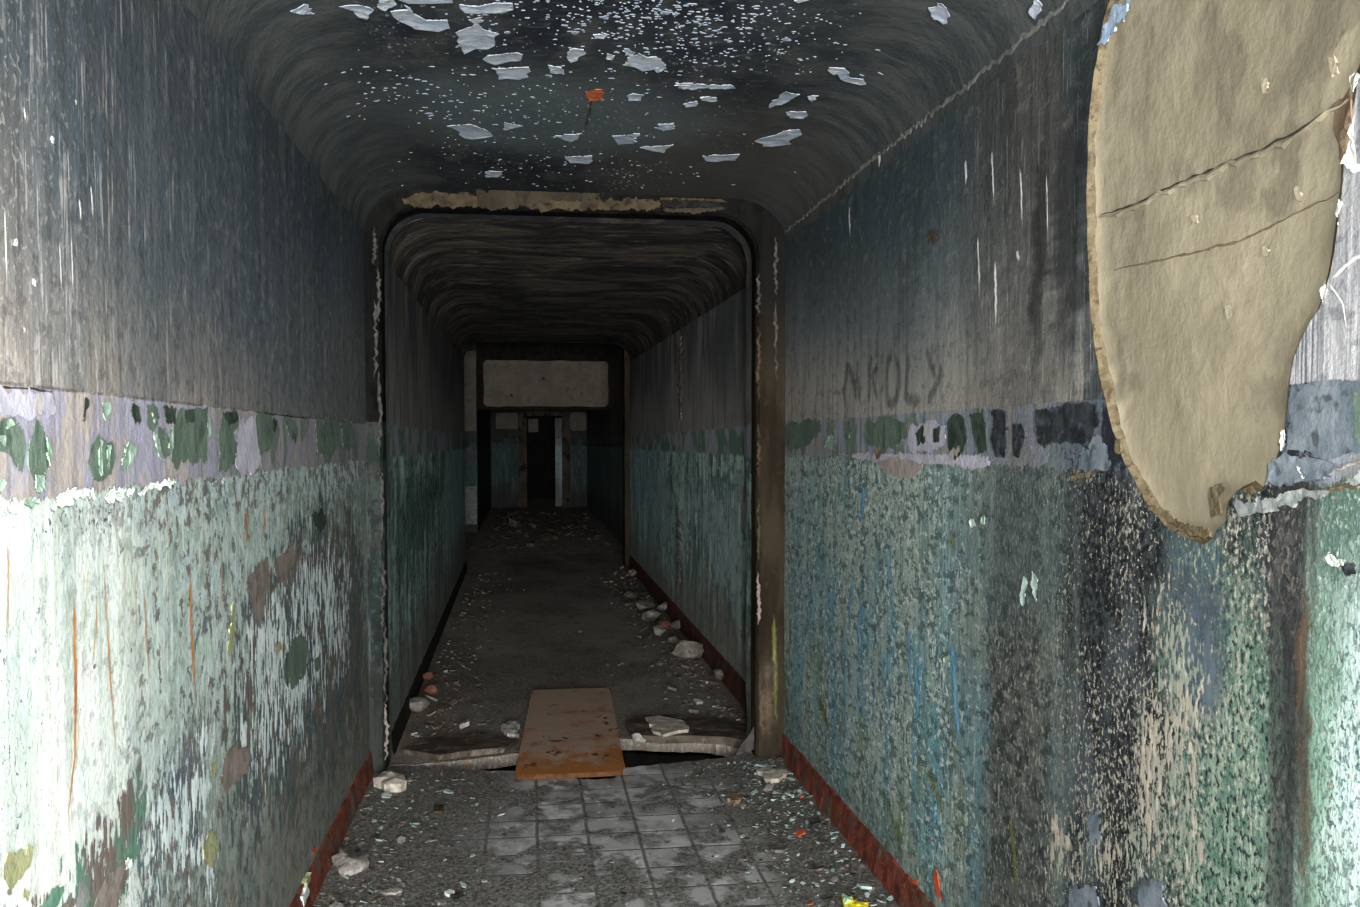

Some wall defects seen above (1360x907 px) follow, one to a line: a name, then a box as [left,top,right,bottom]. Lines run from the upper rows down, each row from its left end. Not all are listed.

peeling [290,4,314,15]
spalling [339,0,883,215]
spalling [785,0,1360,545]
corrosion [69,609,77,807]
corrosion [94,583,114,727]
peeling [0,227,390,907]
water stain [1178,592,1219,713]
water stain [1284,606,1310,841]